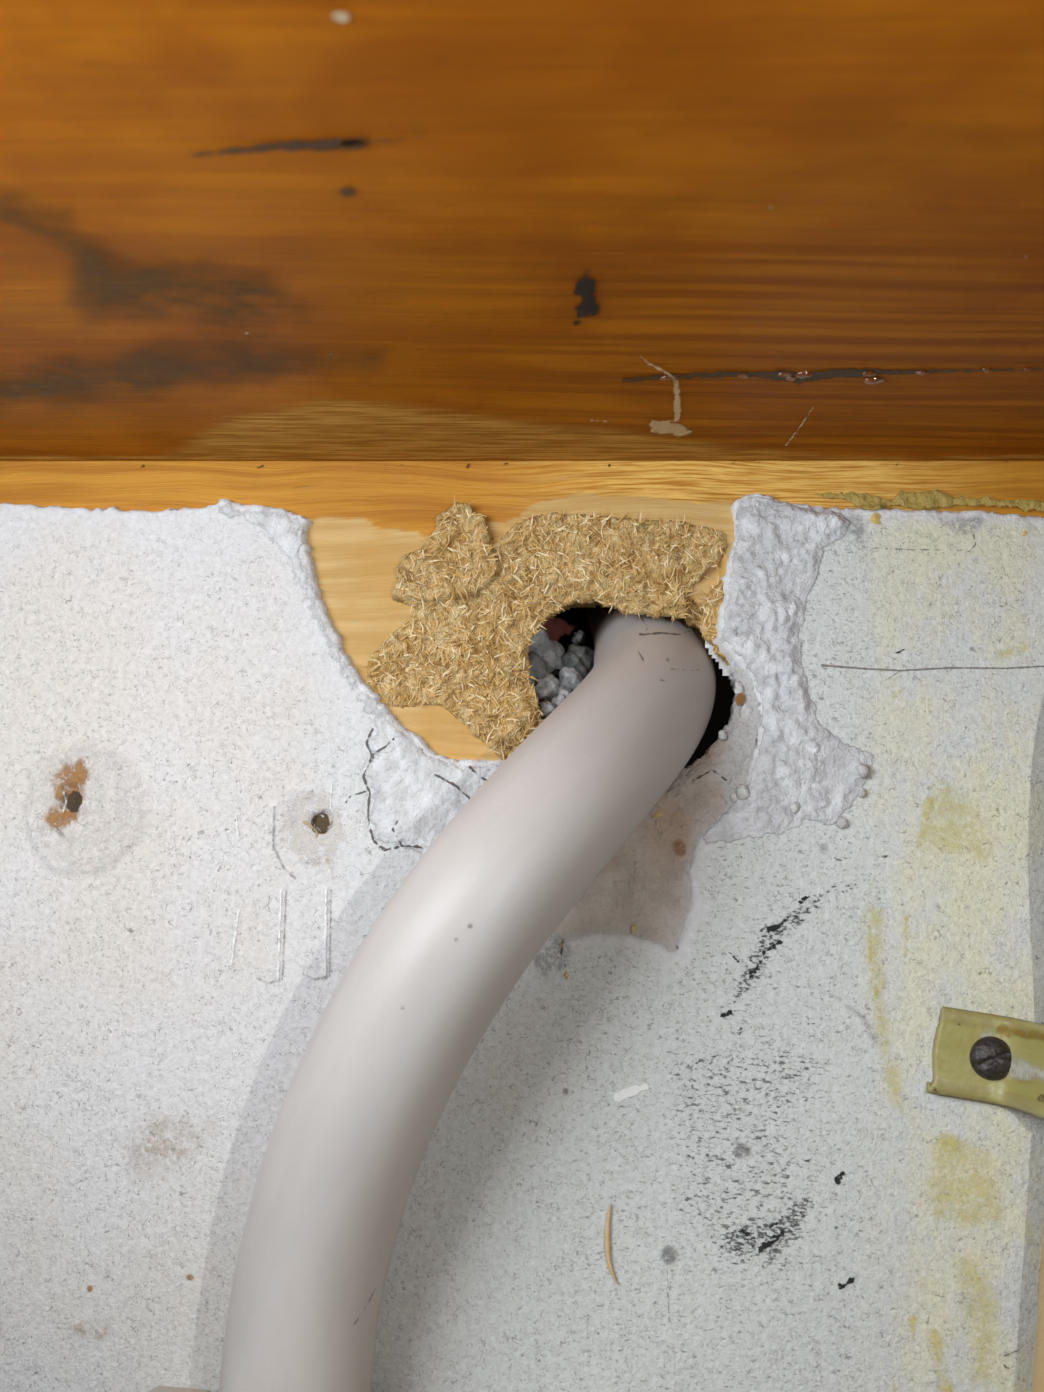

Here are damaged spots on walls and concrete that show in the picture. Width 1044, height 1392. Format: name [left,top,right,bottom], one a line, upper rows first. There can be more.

damp [0,350,289,398]
damp [76,248,272,316]
spalling [218,504,499,855]
spalling [553,496,874,952]